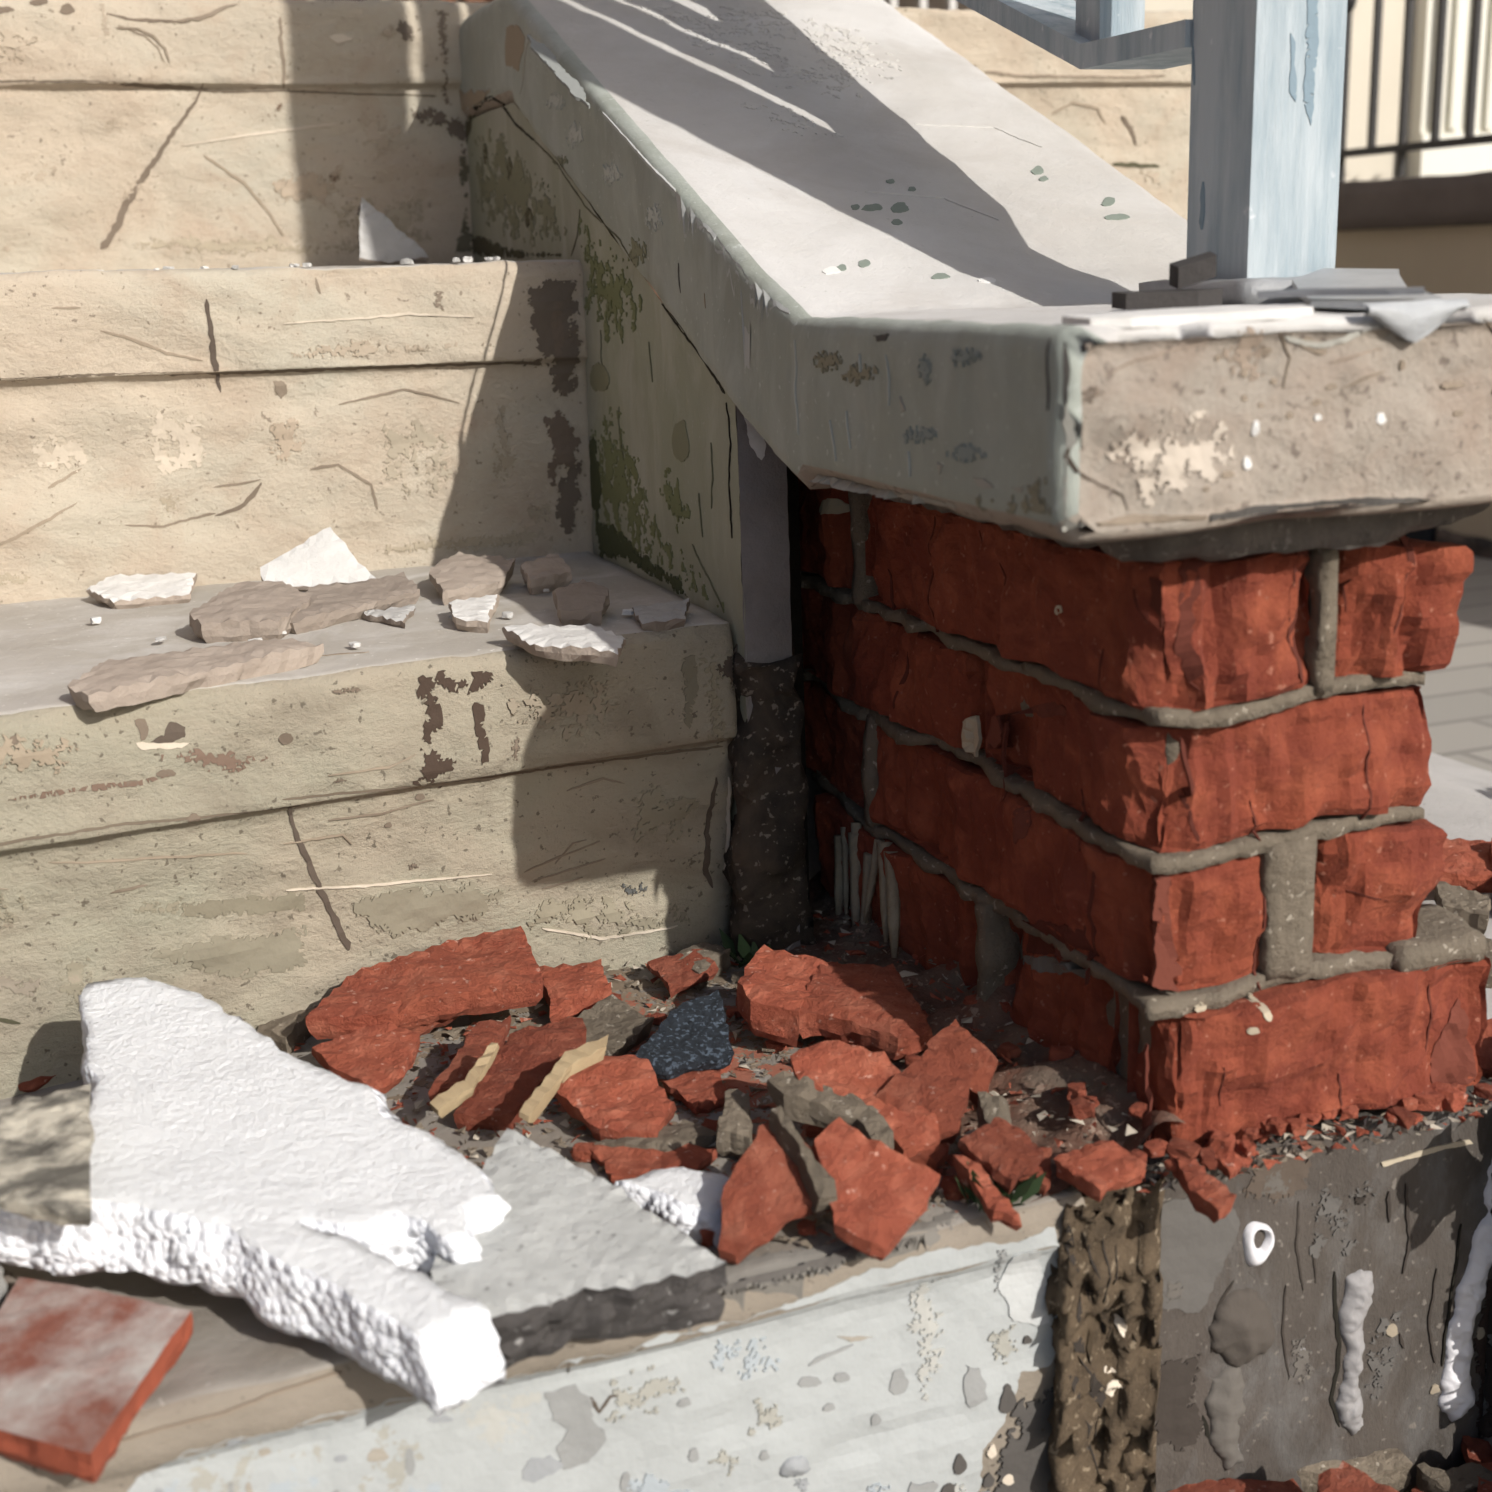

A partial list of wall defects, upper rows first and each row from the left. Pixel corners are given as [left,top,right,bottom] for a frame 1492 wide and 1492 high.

peeling [1289,0,1319,125]
crack [0,4,437,250]
damp [628,237,647,268]
crack [0,299,542,405]
damp [520,279,603,397]
crack [603,112,790,538]
damp [555,460,583,535]
damp [692,443,724,610]
spalling [1060,404,1430,532]
flaking render [67,552,610,750]
crack [0,745,732,951]
spalling [1150,874,1183,993]